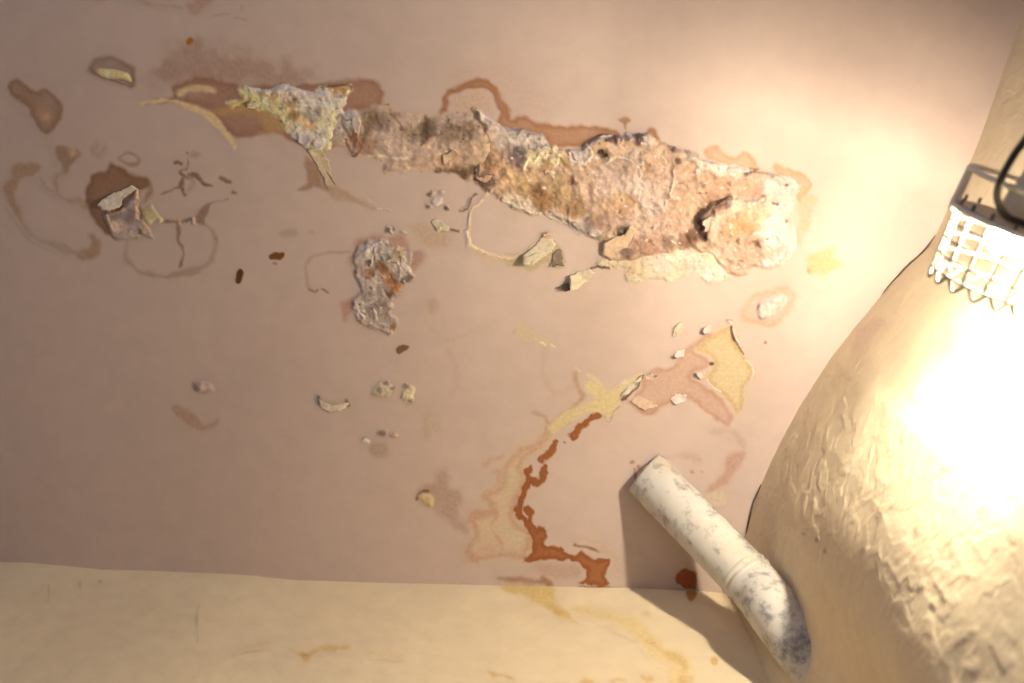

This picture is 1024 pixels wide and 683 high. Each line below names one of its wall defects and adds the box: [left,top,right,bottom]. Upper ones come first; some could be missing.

damp [0,77,143,263]
flaking render [85,52,139,92]
peeling [82,159,165,242]
crack [158,148,240,269]
damp [128,0,388,152]
flaking render [224,82,392,214]
damp [438,52,633,148]
flaking render [335,104,803,430]
peeling [315,394,351,413]
damp [410,318,697,683]
corrosion [512,411,624,588]
corrosion [674,567,699,603]